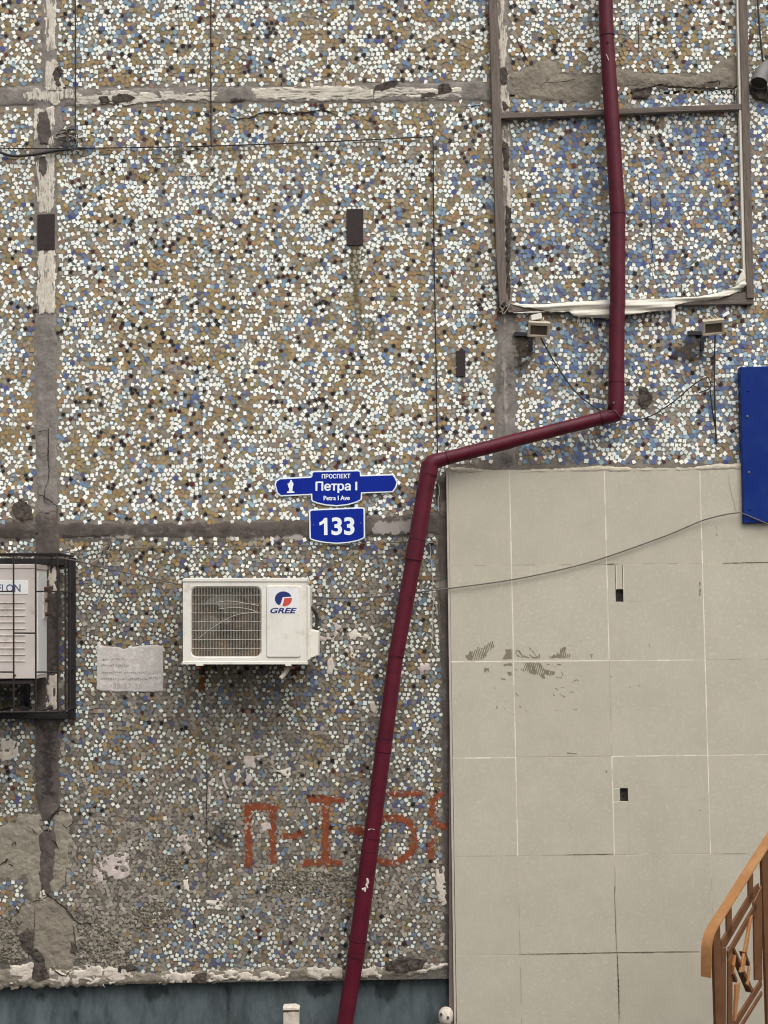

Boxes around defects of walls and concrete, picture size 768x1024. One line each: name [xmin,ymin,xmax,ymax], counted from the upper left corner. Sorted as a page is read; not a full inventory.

crack [226,107,374,120]
peeling [230,79,462,102]
spalling [631,87,651,99]
crack [0,806,75,867]
crack [15,883,92,947]
spalling [0,911,345,990]
spalling [361,958,449,979]
crack [545,886,699,1014]